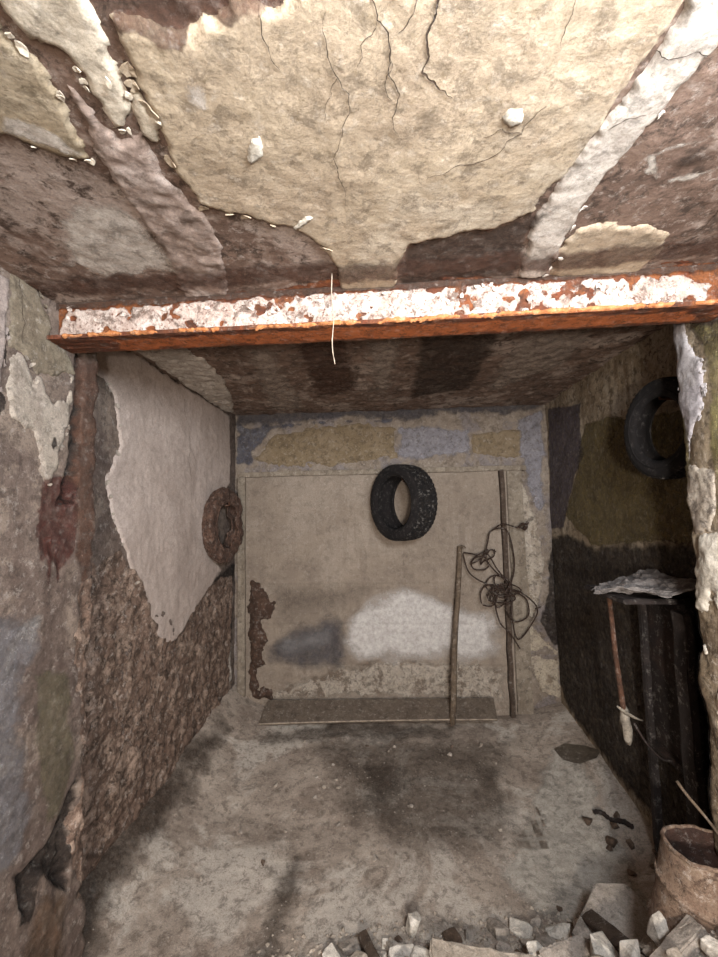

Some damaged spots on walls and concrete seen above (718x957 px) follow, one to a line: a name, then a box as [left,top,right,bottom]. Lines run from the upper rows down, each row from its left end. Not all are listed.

crack [322,11,350,203]
crack [358,0,452,131]
flaking render [0,0,712,486]
water stain [236,341,540,425]
rust [117,311,695,350]
water stain [412,334,496,397]
water stain [492,332,584,389]
rust [36,476,78,580]
rust [247,580,276,700]
spalling [15,323,718,926]